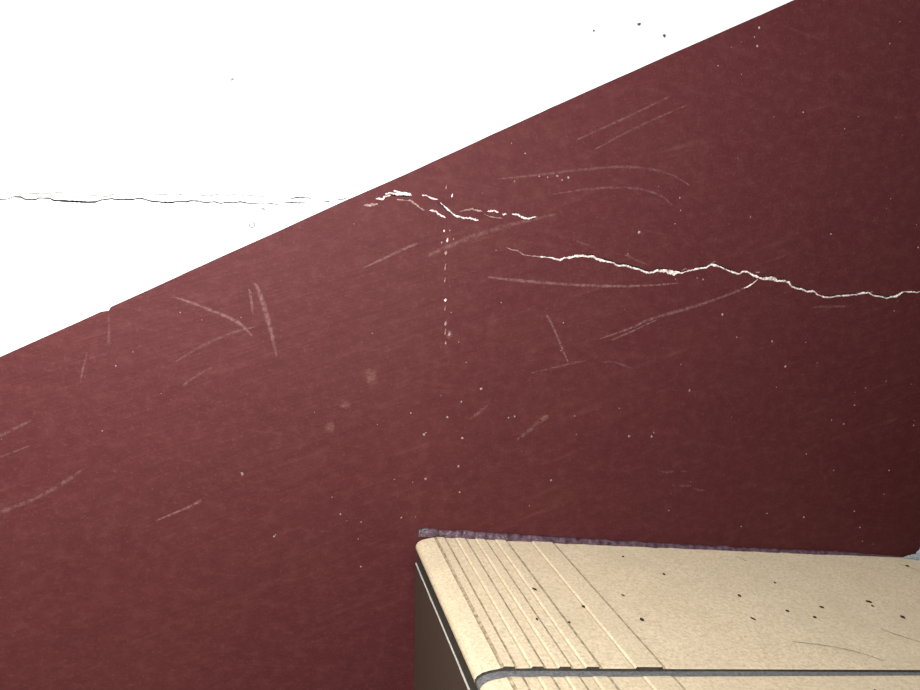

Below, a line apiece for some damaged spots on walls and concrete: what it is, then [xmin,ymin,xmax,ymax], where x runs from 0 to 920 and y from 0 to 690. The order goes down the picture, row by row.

crack [0,185,535,344]
crack [506,247,920,299]